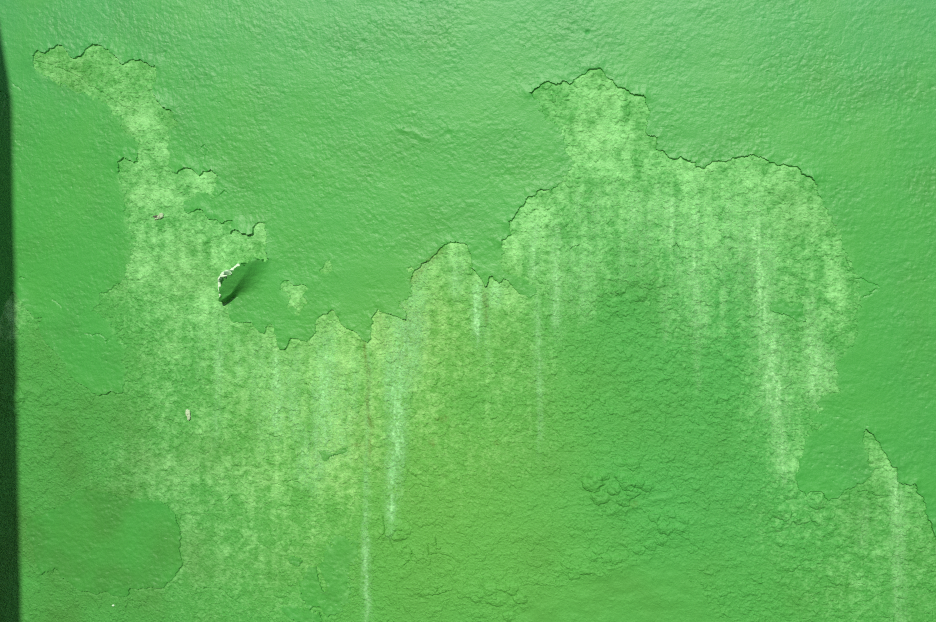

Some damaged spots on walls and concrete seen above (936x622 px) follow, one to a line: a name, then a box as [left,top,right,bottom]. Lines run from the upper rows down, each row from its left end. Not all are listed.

peeling [0,42,538,509]
leakage [386,323,420,520]
leakage [473,283,501,336]
peeling [499,65,936,622]
leakage [749,205,787,421]